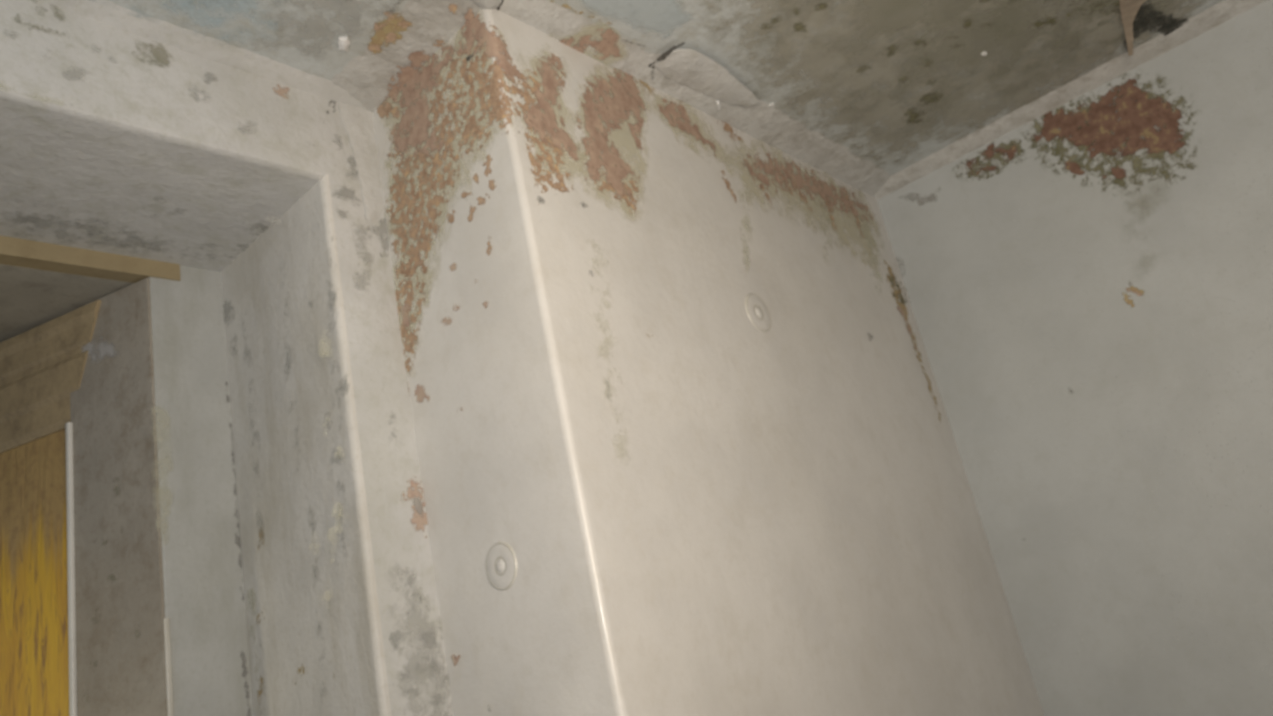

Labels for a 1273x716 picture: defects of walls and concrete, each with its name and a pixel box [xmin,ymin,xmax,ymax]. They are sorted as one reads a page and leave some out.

crack [621,39,684,73]
water stain [743,0,1201,157]